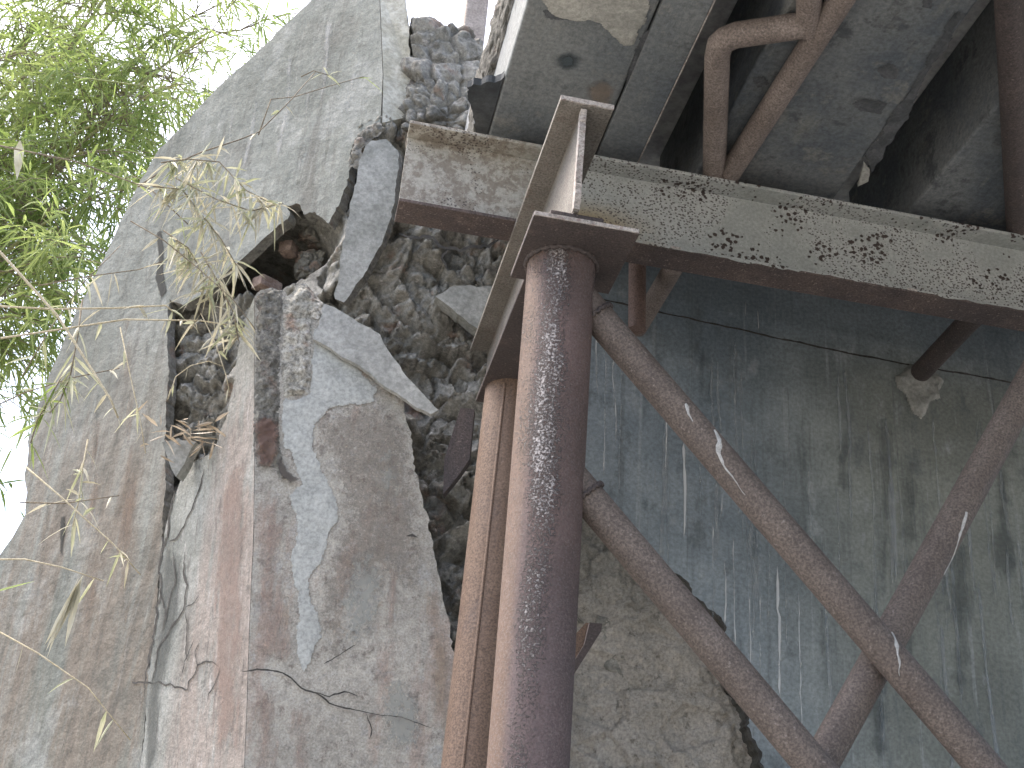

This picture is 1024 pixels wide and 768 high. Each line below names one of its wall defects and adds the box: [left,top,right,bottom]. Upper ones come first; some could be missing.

spalling [475,0,514,79]
spalling [348,123,388,169]
spalling [466,106,476,132]
crack [658,311,913,365]
crack [938,369,1011,383]
peeling [253,284,377,672]
crack [132,469,431,737]
leakage [724,541,736,645]
spalling [570,518,764,768]